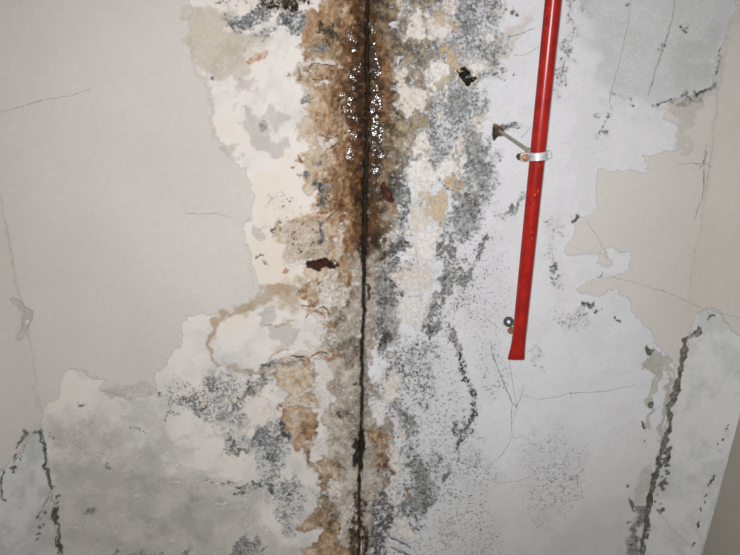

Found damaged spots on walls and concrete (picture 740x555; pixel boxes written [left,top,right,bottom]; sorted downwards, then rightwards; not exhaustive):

peeling [0,0,368,555]
water stain [206,28,407,555]
corrosion [273,0,438,321]
crack [352,0,371,555]
peeling [335,0,740,555]